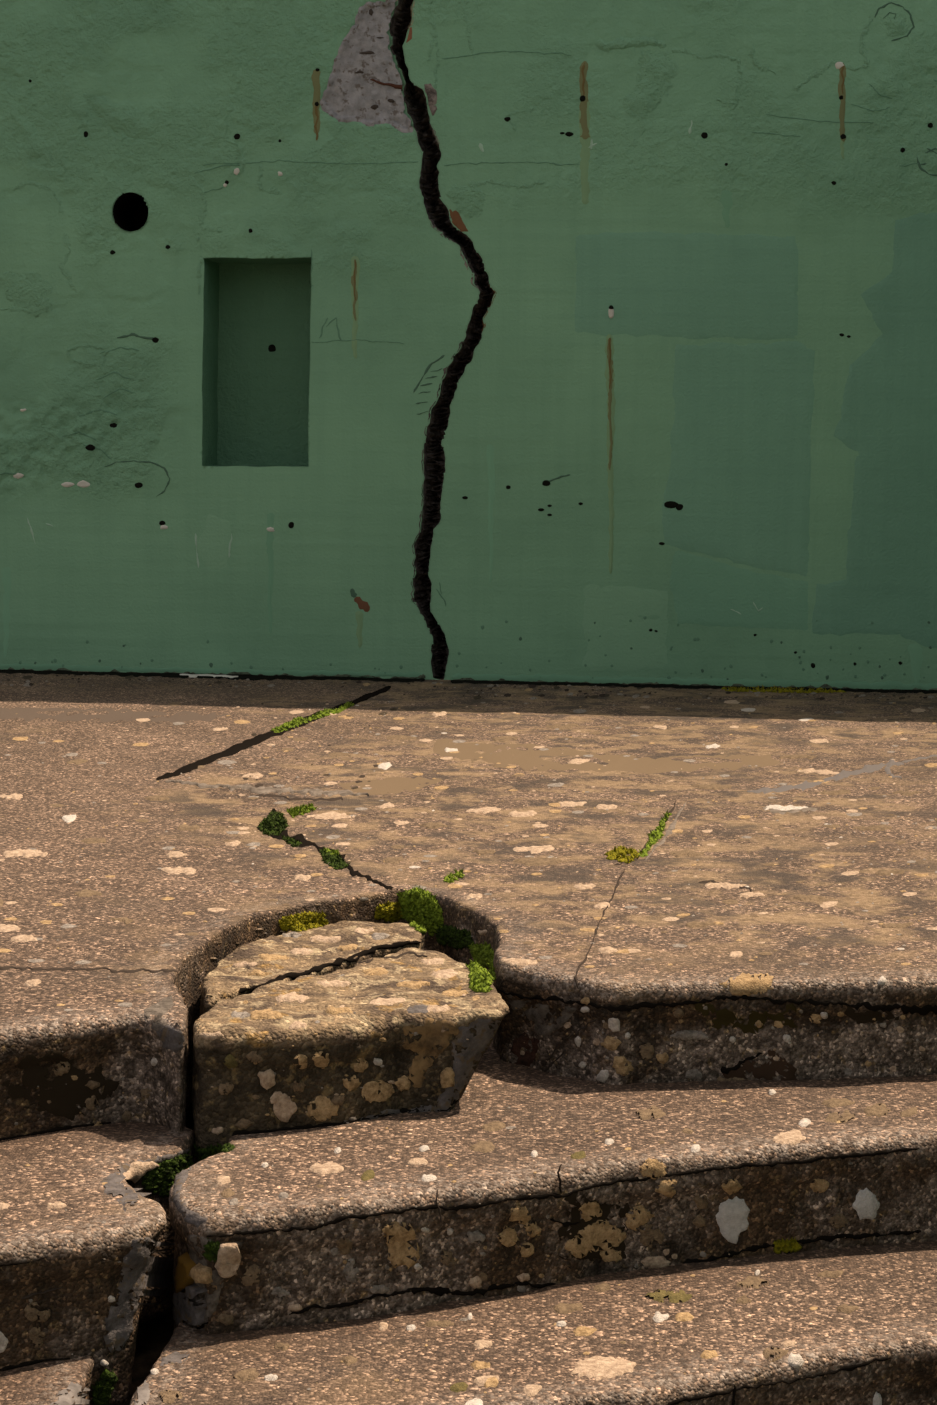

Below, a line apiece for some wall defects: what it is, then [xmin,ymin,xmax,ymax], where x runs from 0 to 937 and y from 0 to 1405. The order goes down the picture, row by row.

spalling [315,0,415,133]
corrosion [579,61,590,139]
corrosion [838,63,846,142]
crack [195,0,580,679]
crack [156,686,391,780]
crack [250,794,393,891]
crack [238,941,427,993]